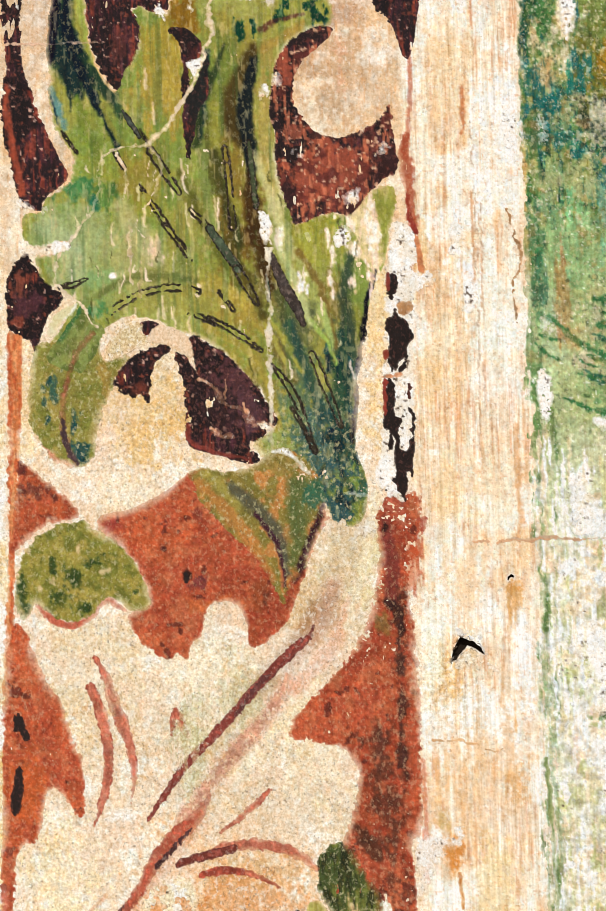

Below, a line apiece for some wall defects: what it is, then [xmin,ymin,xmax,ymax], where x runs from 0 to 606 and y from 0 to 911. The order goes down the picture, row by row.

crack [52,0,216,328]
peeling [341,187,361,205]
spalling [374,132,436,502]
peeling [558,0,577,41]